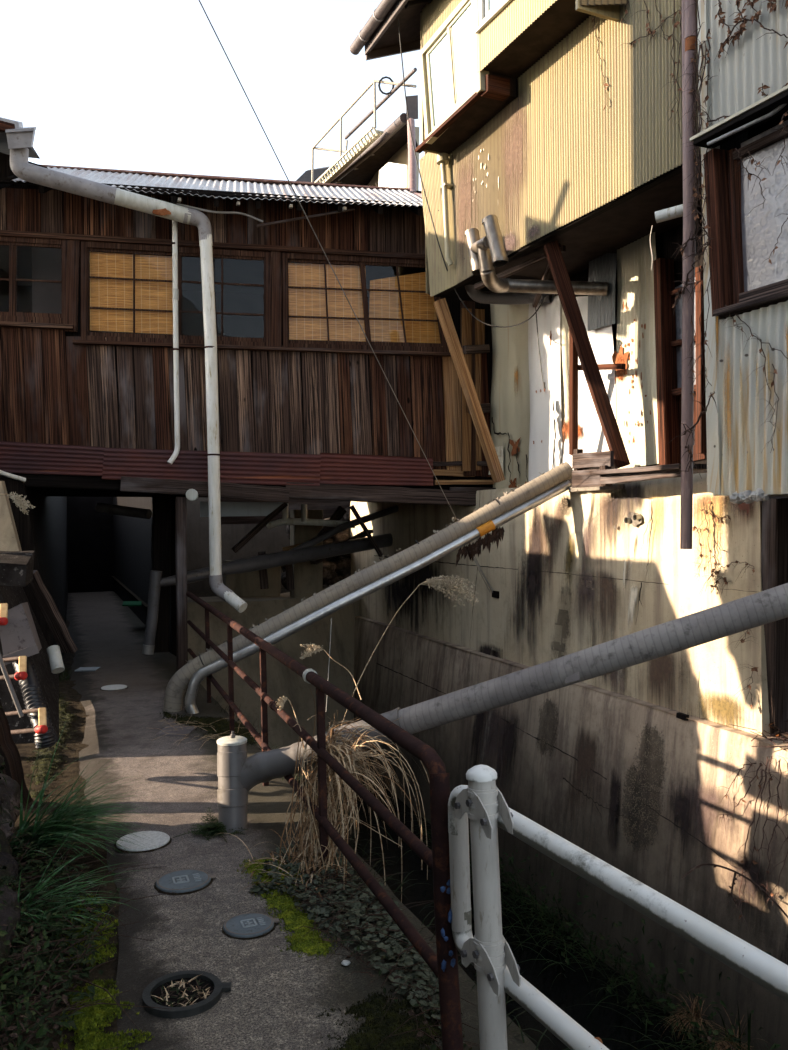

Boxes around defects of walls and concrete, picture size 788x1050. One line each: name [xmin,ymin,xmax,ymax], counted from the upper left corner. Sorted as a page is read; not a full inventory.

damp [504,93,526,210]
corrosion [612,345,629,380]
corrosion [724,357,742,453]
damp [513,483,641,639]
damp [470,710,519,785]
damp [565,729,597,832]
damp [607,772,621,848]
damp [647,654,690,713]
damp [670,778,730,854]
damp [701,693,741,729]